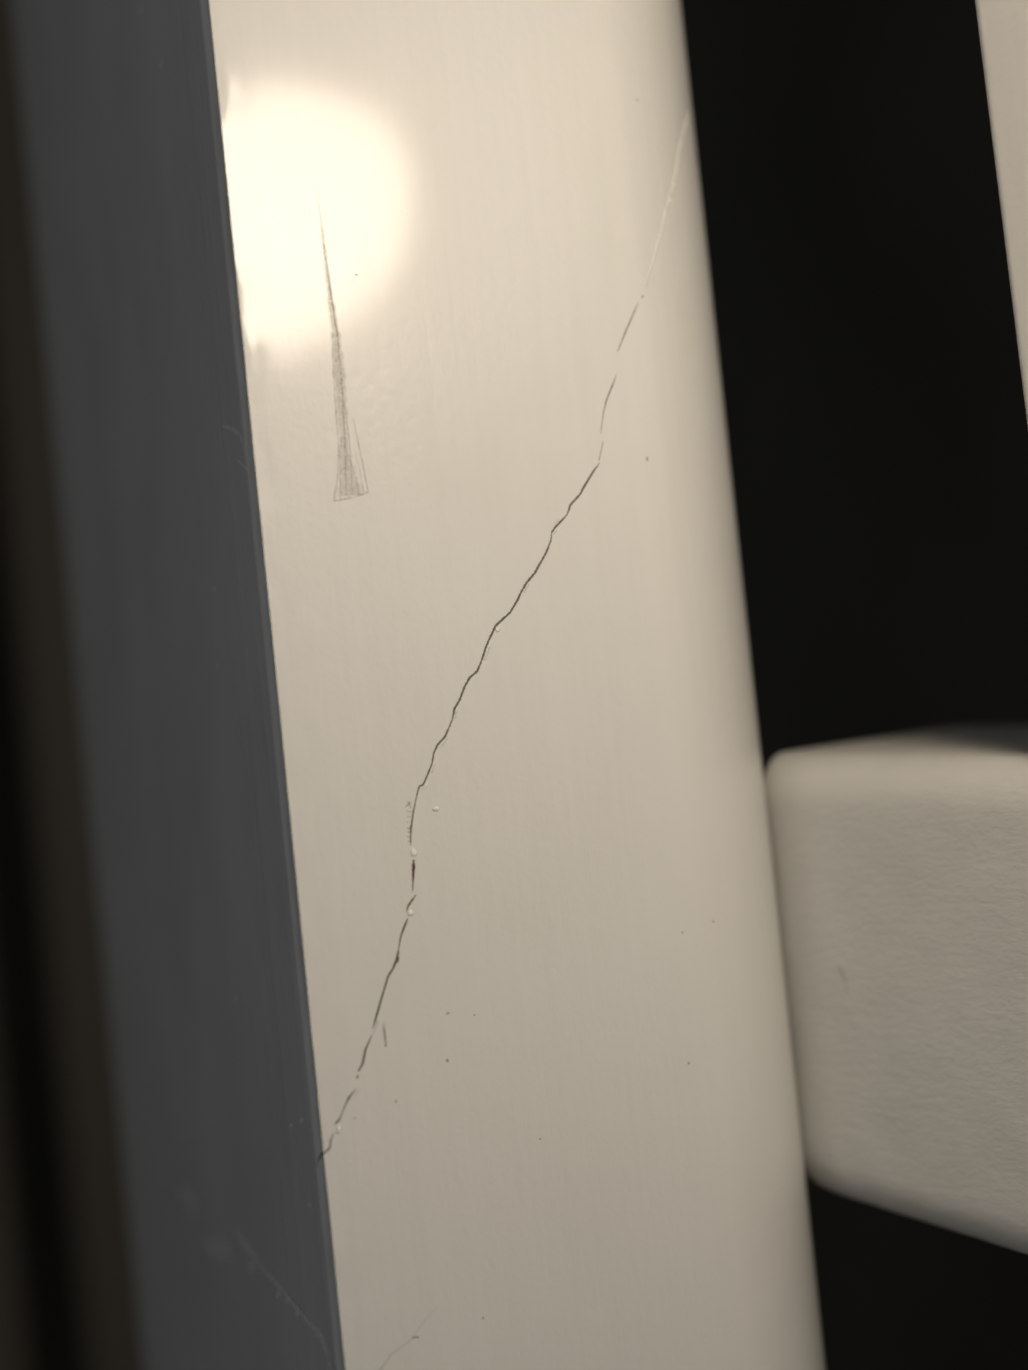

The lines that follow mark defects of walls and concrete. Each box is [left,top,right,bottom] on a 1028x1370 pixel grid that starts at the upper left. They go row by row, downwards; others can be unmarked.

crack [622,114,690,341]
crack [318,464,599,1159]